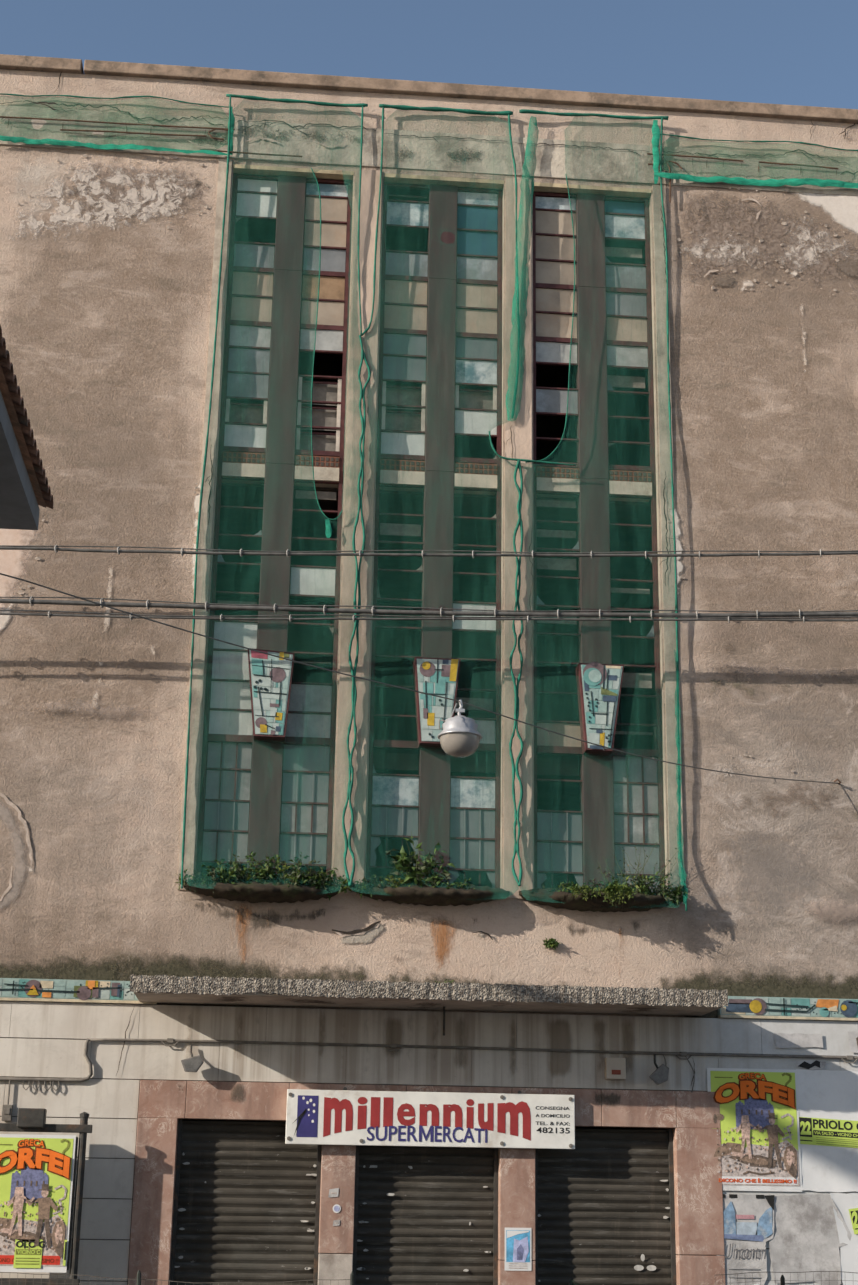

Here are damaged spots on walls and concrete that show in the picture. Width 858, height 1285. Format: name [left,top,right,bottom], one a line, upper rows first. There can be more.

flaking render [0,116,361,239]
flaking render [647,153,858,297]
water stain [0,793,33,908]
spalling [332,921,384,944]
corrosion [431,921,453,966]